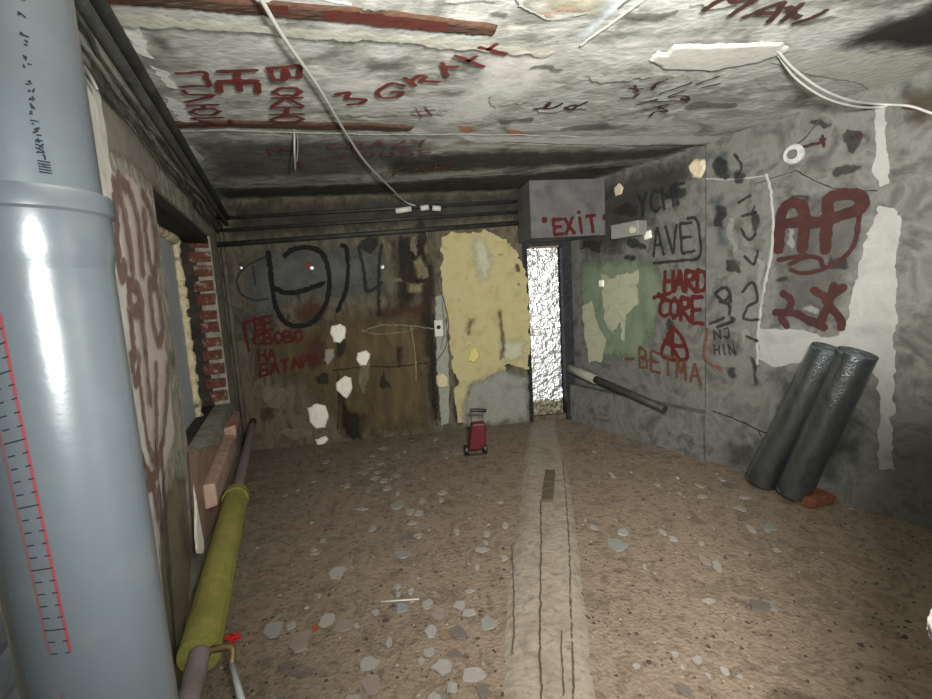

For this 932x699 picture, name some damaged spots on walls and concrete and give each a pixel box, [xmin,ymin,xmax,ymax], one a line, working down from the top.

peeling [245,249,381,318]
peeling [392,236,429,293]
peeling [435,229,531,427]
peeling [580,260,663,363]
peeling [359,360,371,394]